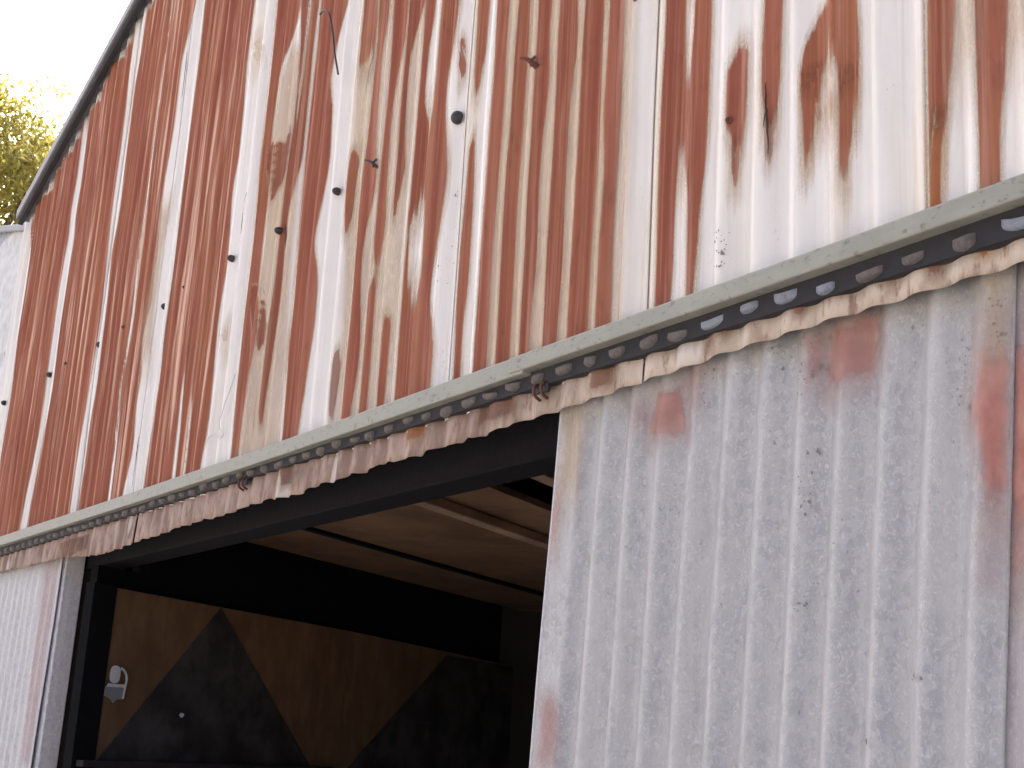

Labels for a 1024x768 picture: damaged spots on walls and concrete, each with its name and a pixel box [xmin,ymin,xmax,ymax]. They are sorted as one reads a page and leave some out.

corrosion [0,0,255,537]
corrosion [231,0,348,458]
corrosion [328,0,626,420]
corrosion [651,390,685,435]
corrosion [654,0,712,307]
corrosion [725,45,748,187]
corrosion [761,0,782,128]
corrosion [800,0,860,183]
corrosion [828,317,878,383]
corrosion [927,0,955,207]
corrosion [974,0,1009,189]
corrosion [971,345,1024,572]